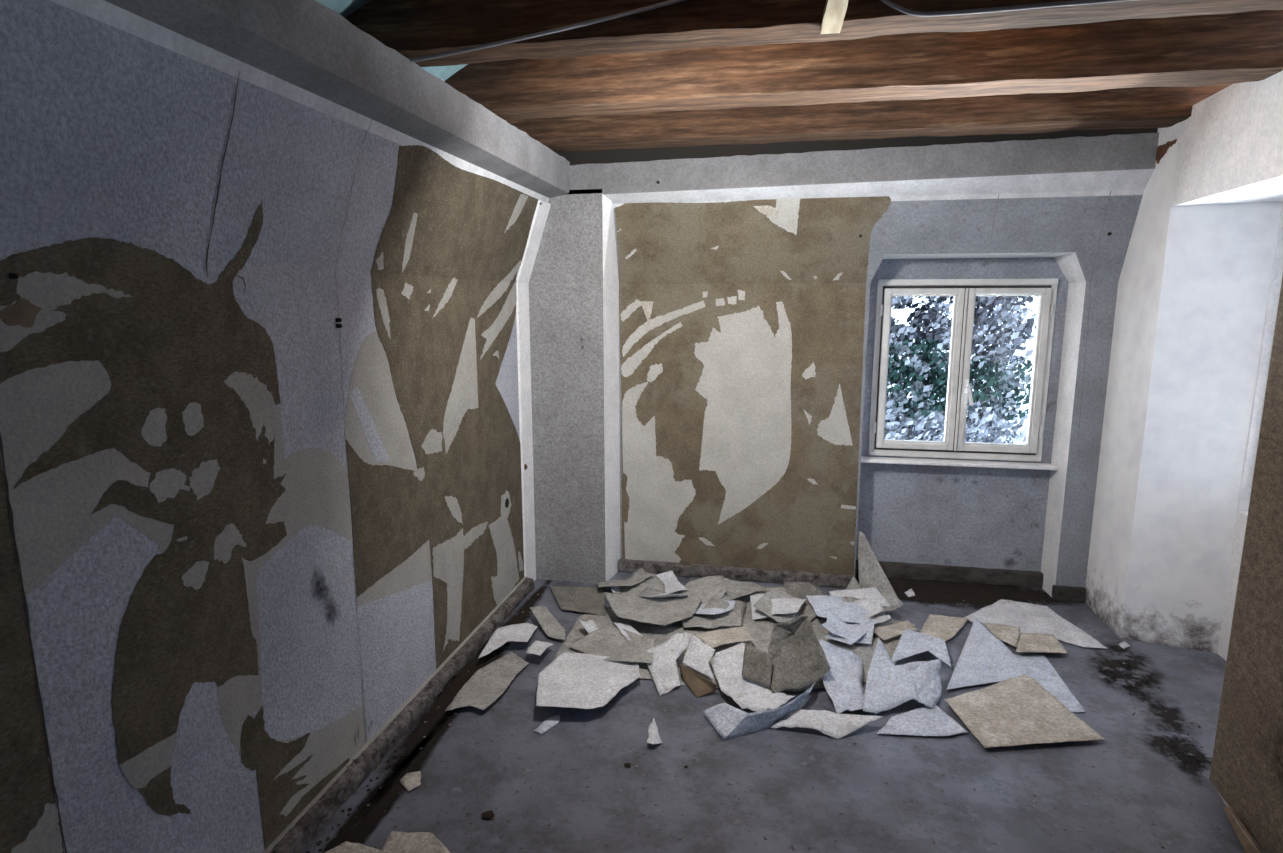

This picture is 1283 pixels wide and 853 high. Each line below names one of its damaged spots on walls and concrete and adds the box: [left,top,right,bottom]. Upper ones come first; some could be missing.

peeling [504,194,528,233]
peeling [753,198,800,235]
peeling [0,271,133,352]
peeling [344,213,521,481]
peeling [0,360,221,596]
peeling [620,290,853,563]
peeling [181,372,351,756]
peeling [356,491,524,651]
peeling [118,732,177,788]
peeling [273,704,366,816]
peeling [11,803,66,853]